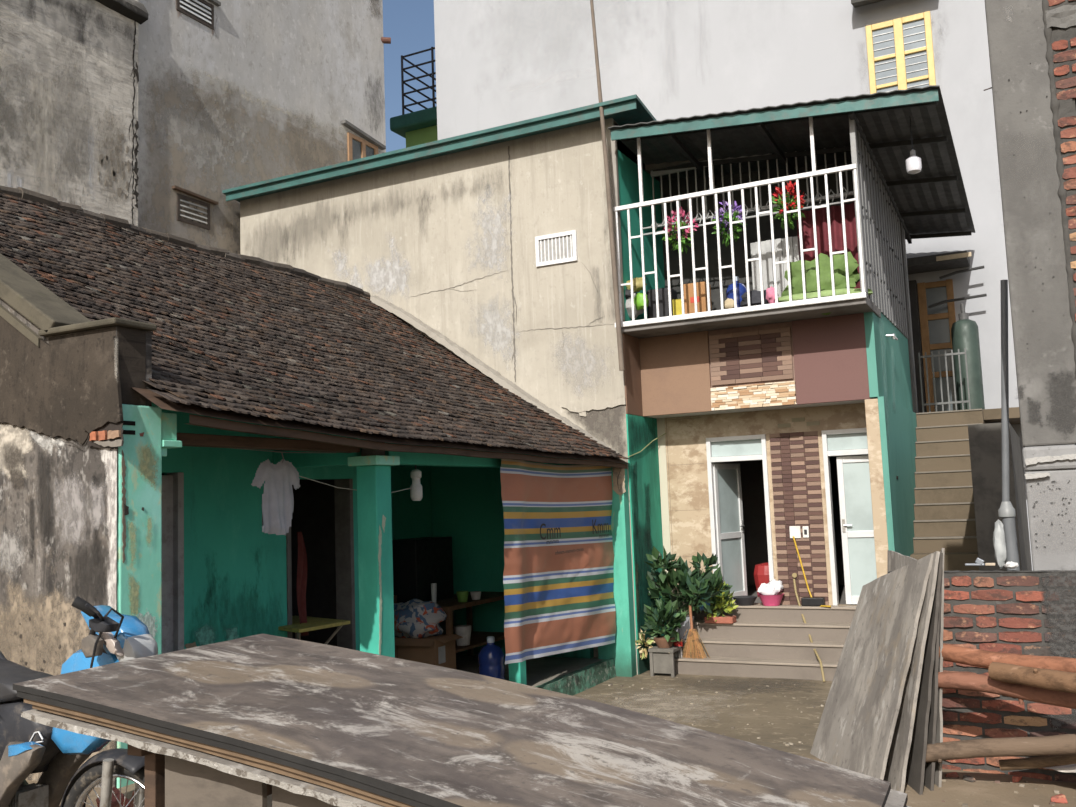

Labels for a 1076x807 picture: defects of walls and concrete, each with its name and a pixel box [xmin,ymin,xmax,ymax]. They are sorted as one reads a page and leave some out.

damp [0,69,88,196]
crack [128,21,139,225]
damp [143,75,372,254]
crack [411,146,613,382]
peeling [0,534,25,571]
damp [4,447,24,488]
flaking render [0,424,32,478]
damp [29,430,64,557]
damp [0,520,106,676]
peeling [54,411,152,610]
peeling [129,577,157,641]
peeling [140,432,156,483]